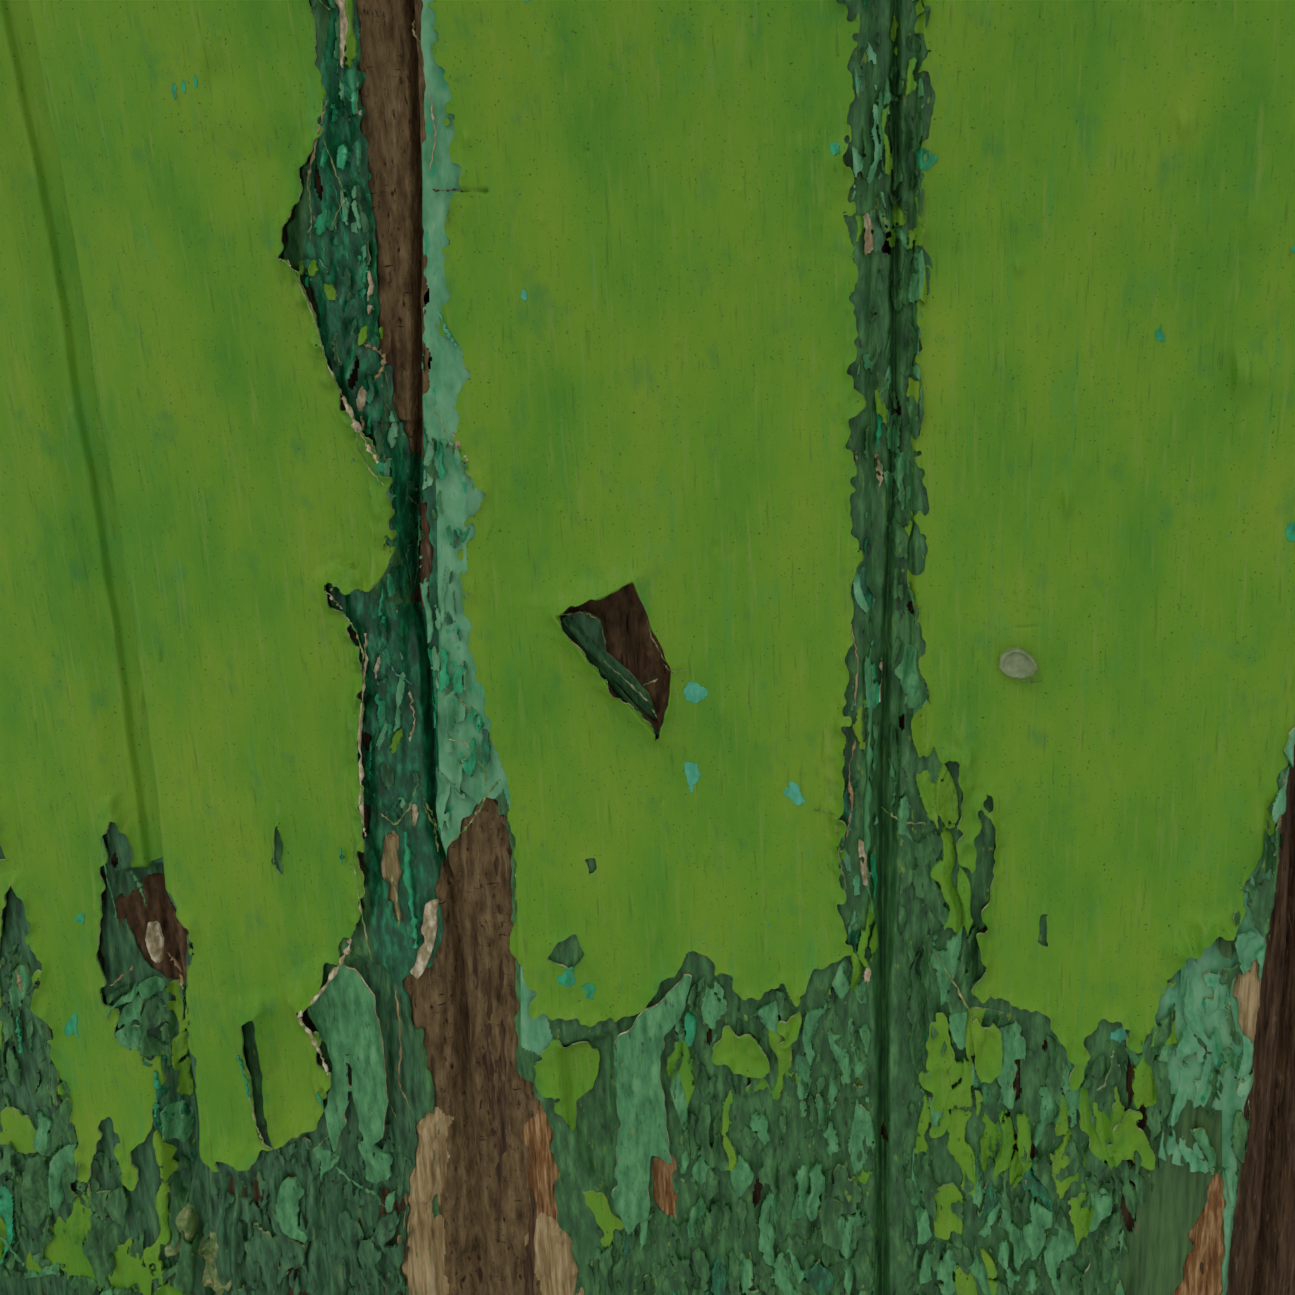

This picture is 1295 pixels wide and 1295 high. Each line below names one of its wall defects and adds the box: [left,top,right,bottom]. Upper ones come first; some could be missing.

peeling [0,0,640,1295]
peeling [608,0,1295,1295]